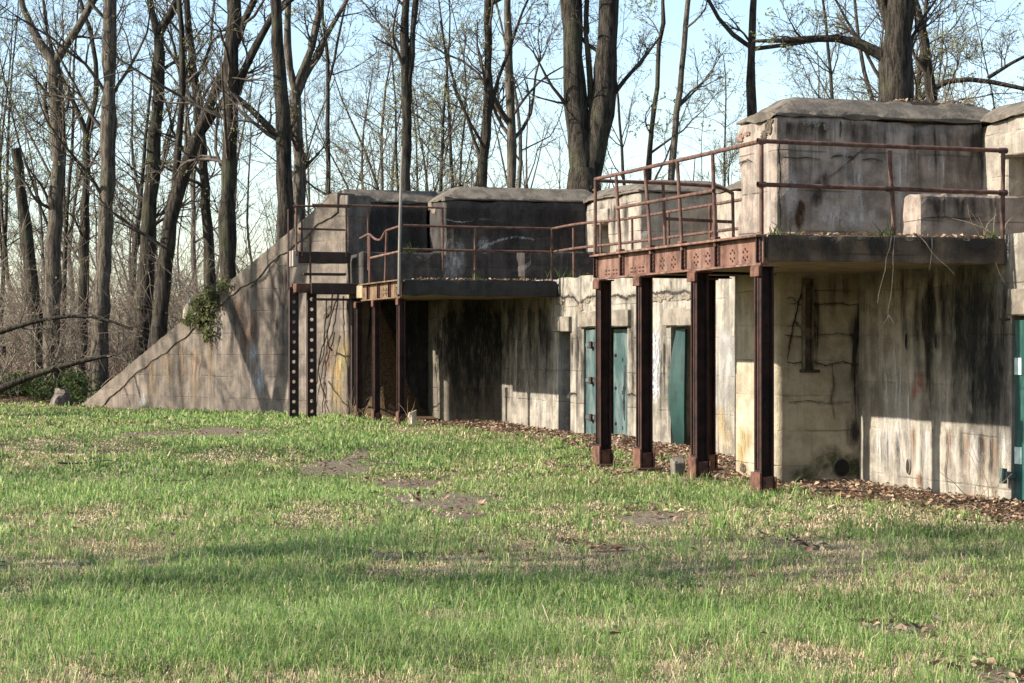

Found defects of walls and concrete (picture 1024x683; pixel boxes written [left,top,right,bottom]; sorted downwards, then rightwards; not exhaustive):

leakage [786,122,827,137]
leakage [969,127,984,171]
corrosion [795,201,804,228]
leakage [927,198,941,218]
leakage [956,197,982,216]
leakage [387,301,551,395]
crack [787,276,857,417]
leakage [901,266,1007,475]
leakage [879,435,899,470]